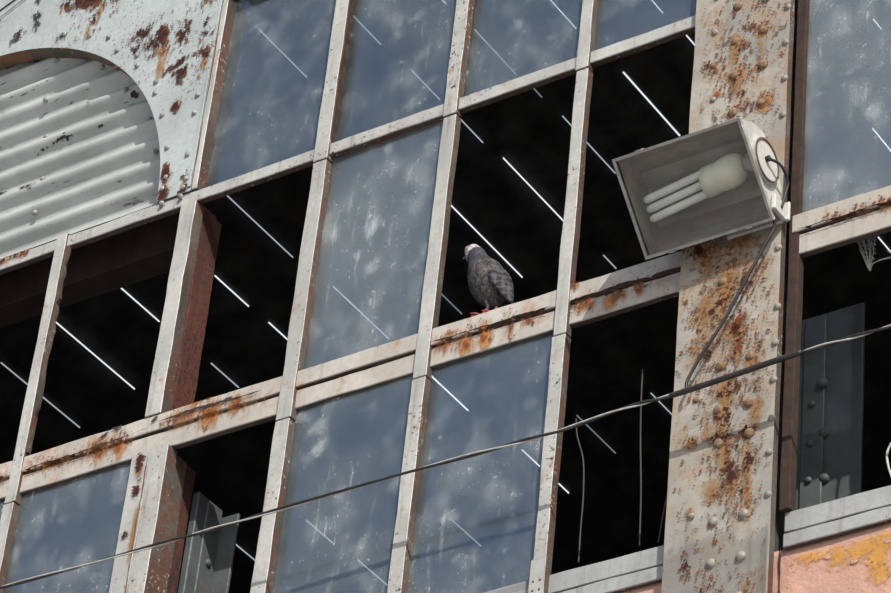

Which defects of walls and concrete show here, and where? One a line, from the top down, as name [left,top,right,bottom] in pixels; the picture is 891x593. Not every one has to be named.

corrosion [49,0,120,53]
corrosion [113,0,217,83]
corrosion [694,0,788,138]
corrosion [157,161,188,200]
corrosion [815,195,891,223]
corrosion [436,308,543,356]
corrosion [160,391,246,431]
corrosion [673,228,775,593]
corrosion [24,426,146,559]
crack [776,546,784,593]
peeling [792,531,891,585]